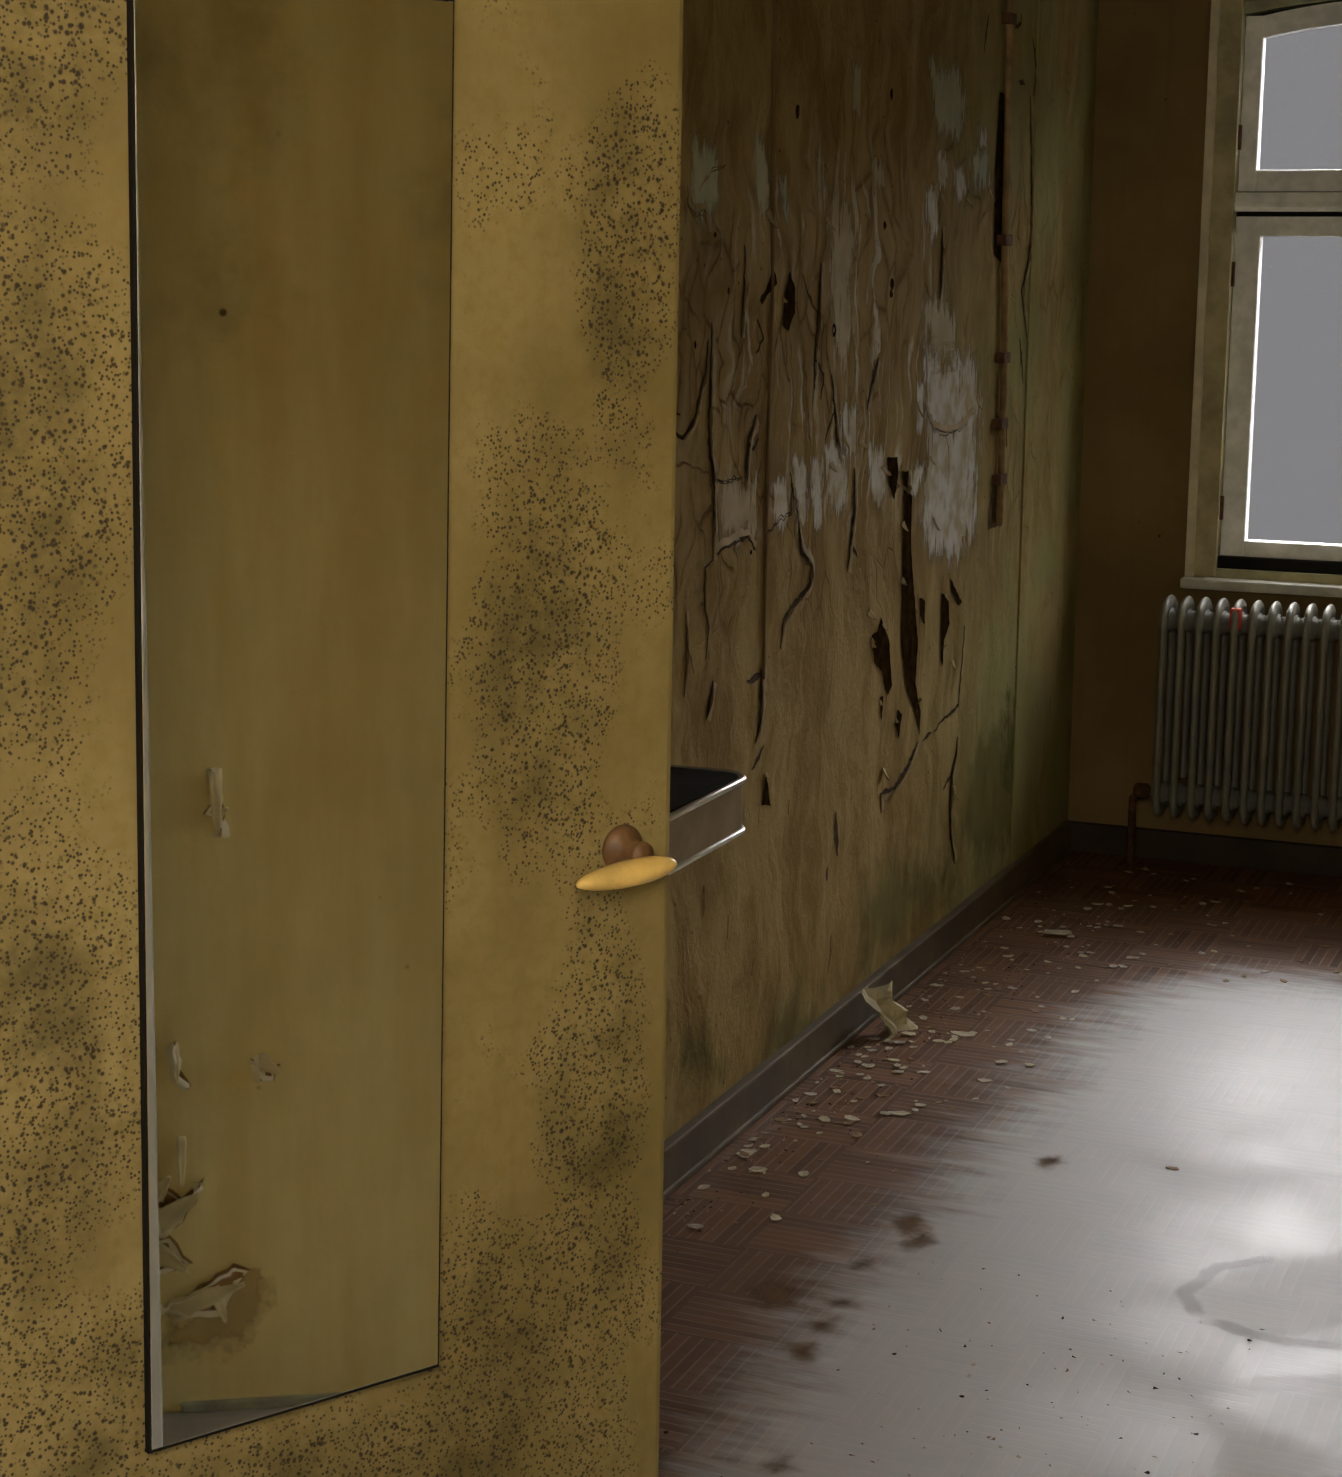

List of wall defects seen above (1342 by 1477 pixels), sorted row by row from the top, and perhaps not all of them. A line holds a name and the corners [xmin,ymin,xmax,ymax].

peeling [691,134,721,229]
peeling [755,130,789,223]
spalling [760,268,797,331]
peeling [815,139,857,375]
crack [938,227,946,301]
peeling [924,56,1005,262]
crack [984,13,1037,380]
crack [676,245,881,770]
peeling [715,281,1007,737]
crack [926,401,974,478]
crack [826,812,839,881]
crack [880,626,965,864]